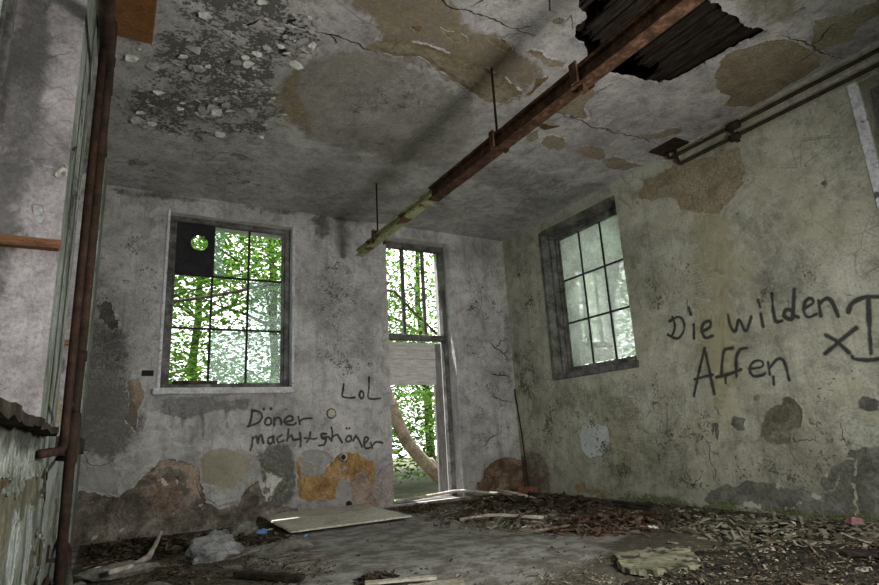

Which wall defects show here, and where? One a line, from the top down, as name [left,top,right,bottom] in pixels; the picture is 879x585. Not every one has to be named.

crack [442,0,533,37]
water stain [118,0,543,166]
peeling [363,26,566,103]
peeling [555,88,597,120]
peeling [639,1,879,141]
peeling [526,130,642,171]
peeling [637,145,747,219]
water stain [83,321,144,461]
flaking render [142,460,201,518]
flaking render [256,450,379,509]